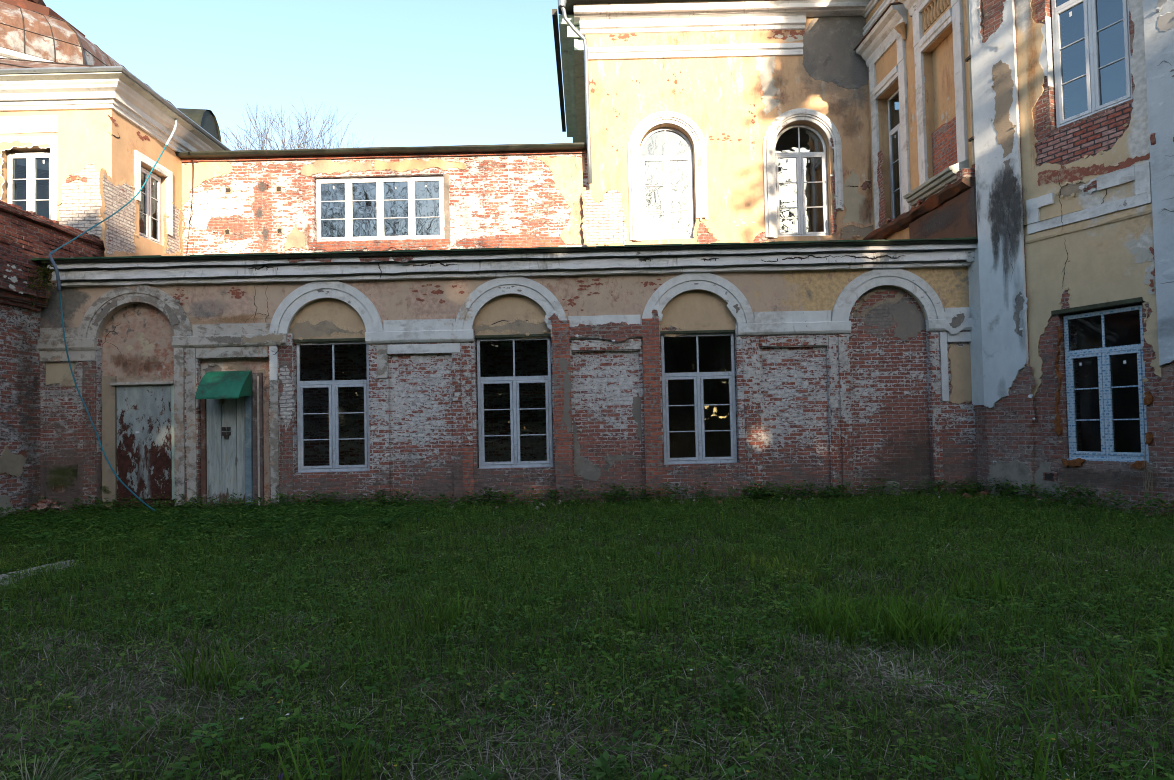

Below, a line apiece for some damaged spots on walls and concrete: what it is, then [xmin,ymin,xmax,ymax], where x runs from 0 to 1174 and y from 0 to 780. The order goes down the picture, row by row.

flaking render [1155,0,1174,33]
spalling [1032,91,1156,203]
spalling [57,160,138,257]
flaking render [163,161,234,256]
spalling [206,155,630,253]
leakage [919,170,1027,274]
flaking render [942,307,972,405]
peeling [1011,290,1028,339]
spalling [1028,286,1073,482]